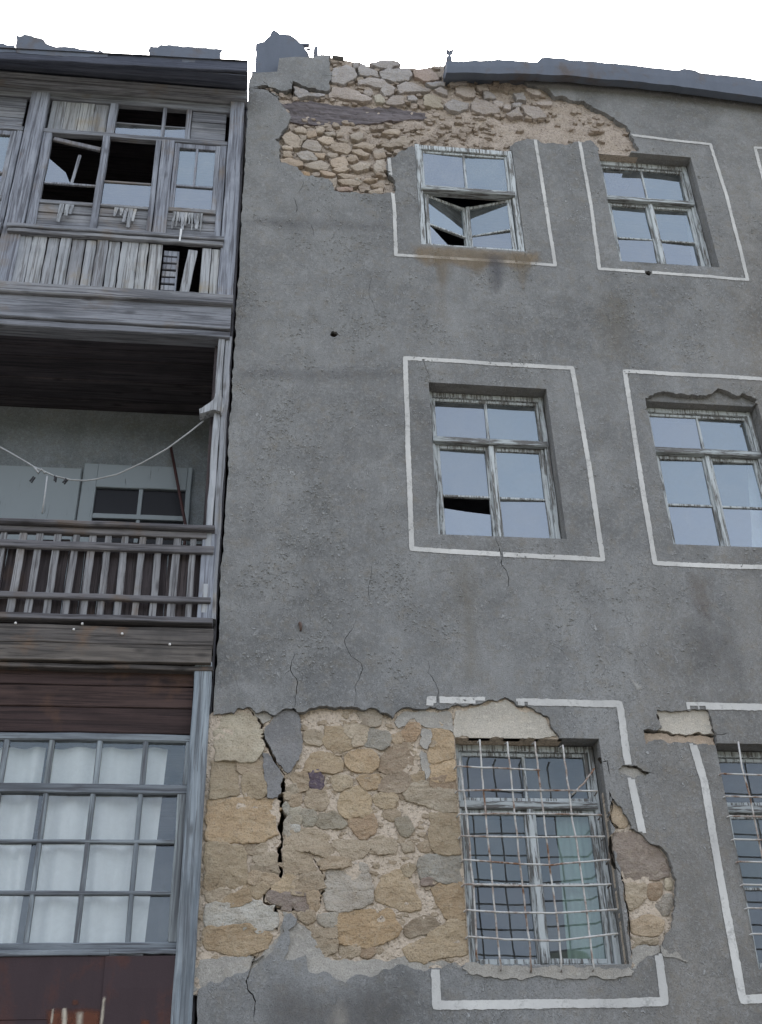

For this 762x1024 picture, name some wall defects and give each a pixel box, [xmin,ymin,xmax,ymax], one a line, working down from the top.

flaking render [266,58,637,194]
flaking render [646,392,757,423]
crack [261,728,286,878]
flaking render [193,698,563,1002]
flaking render [602,792,675,969]
flaking render [644,710,717,747]